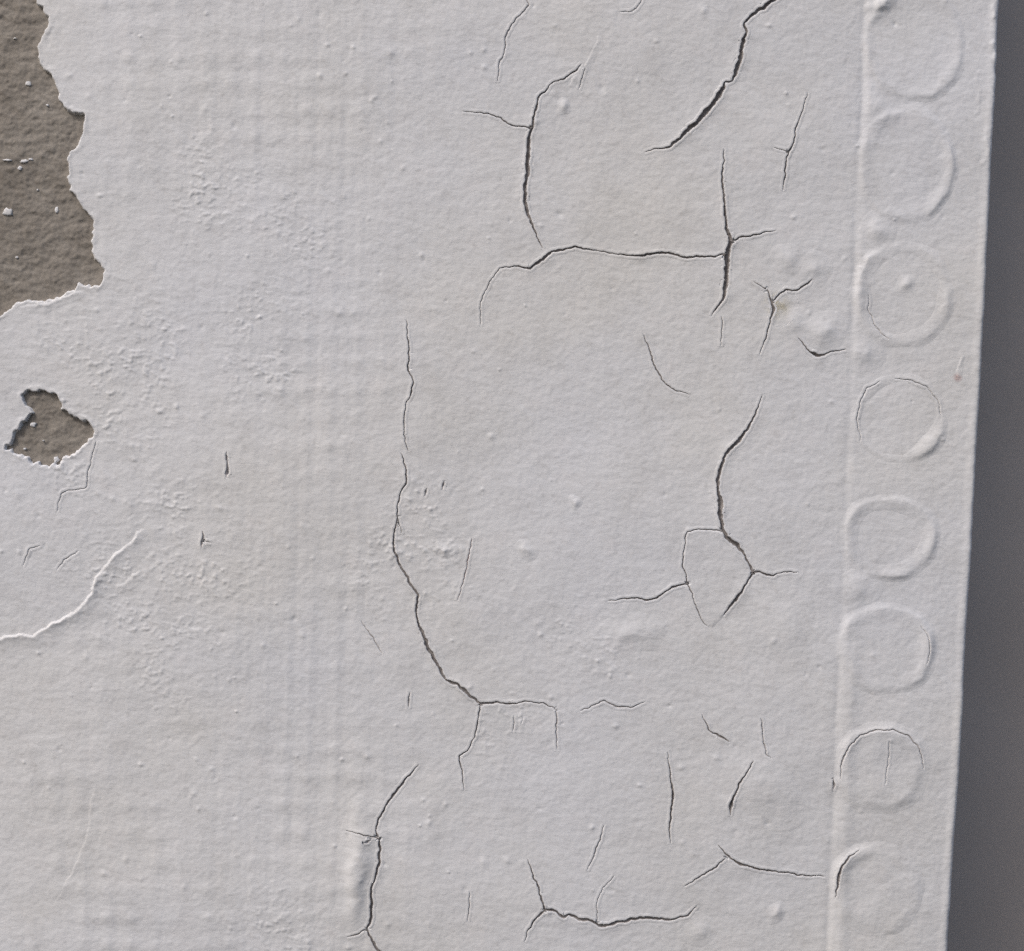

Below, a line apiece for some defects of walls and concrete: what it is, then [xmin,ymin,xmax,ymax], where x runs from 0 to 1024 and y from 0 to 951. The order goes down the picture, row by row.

crack [494,0,533,83]
crack [620,0,645,16]
crack [644,0,781,156]
flaking render [0,0,105,316]
crack [462,62,847,360]
flaking render [7,391,94,466]
crack [640,333,691,398]
peeling [0,528,152,659]
crack [389,318,646,790]
crack [607,393,798,629]
crack [344,762,421,951]
crack [522,824,862,943]